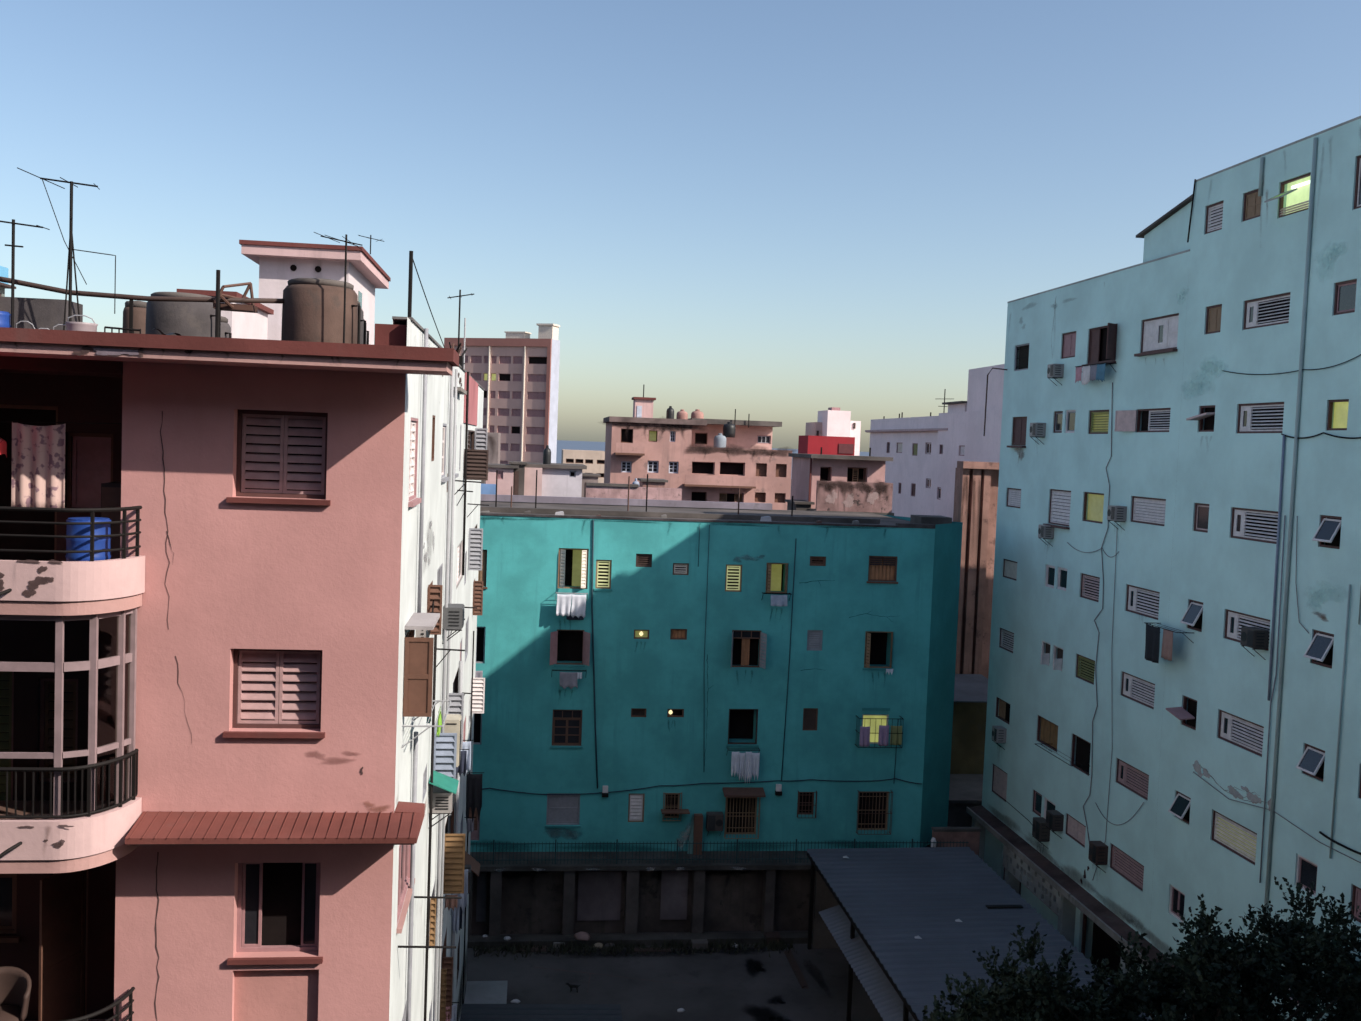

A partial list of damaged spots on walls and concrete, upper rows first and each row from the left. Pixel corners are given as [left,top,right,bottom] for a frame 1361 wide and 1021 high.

peeling [22,566,54,597]
crack [160,411,192,738]
crack [152,852,160,1020]